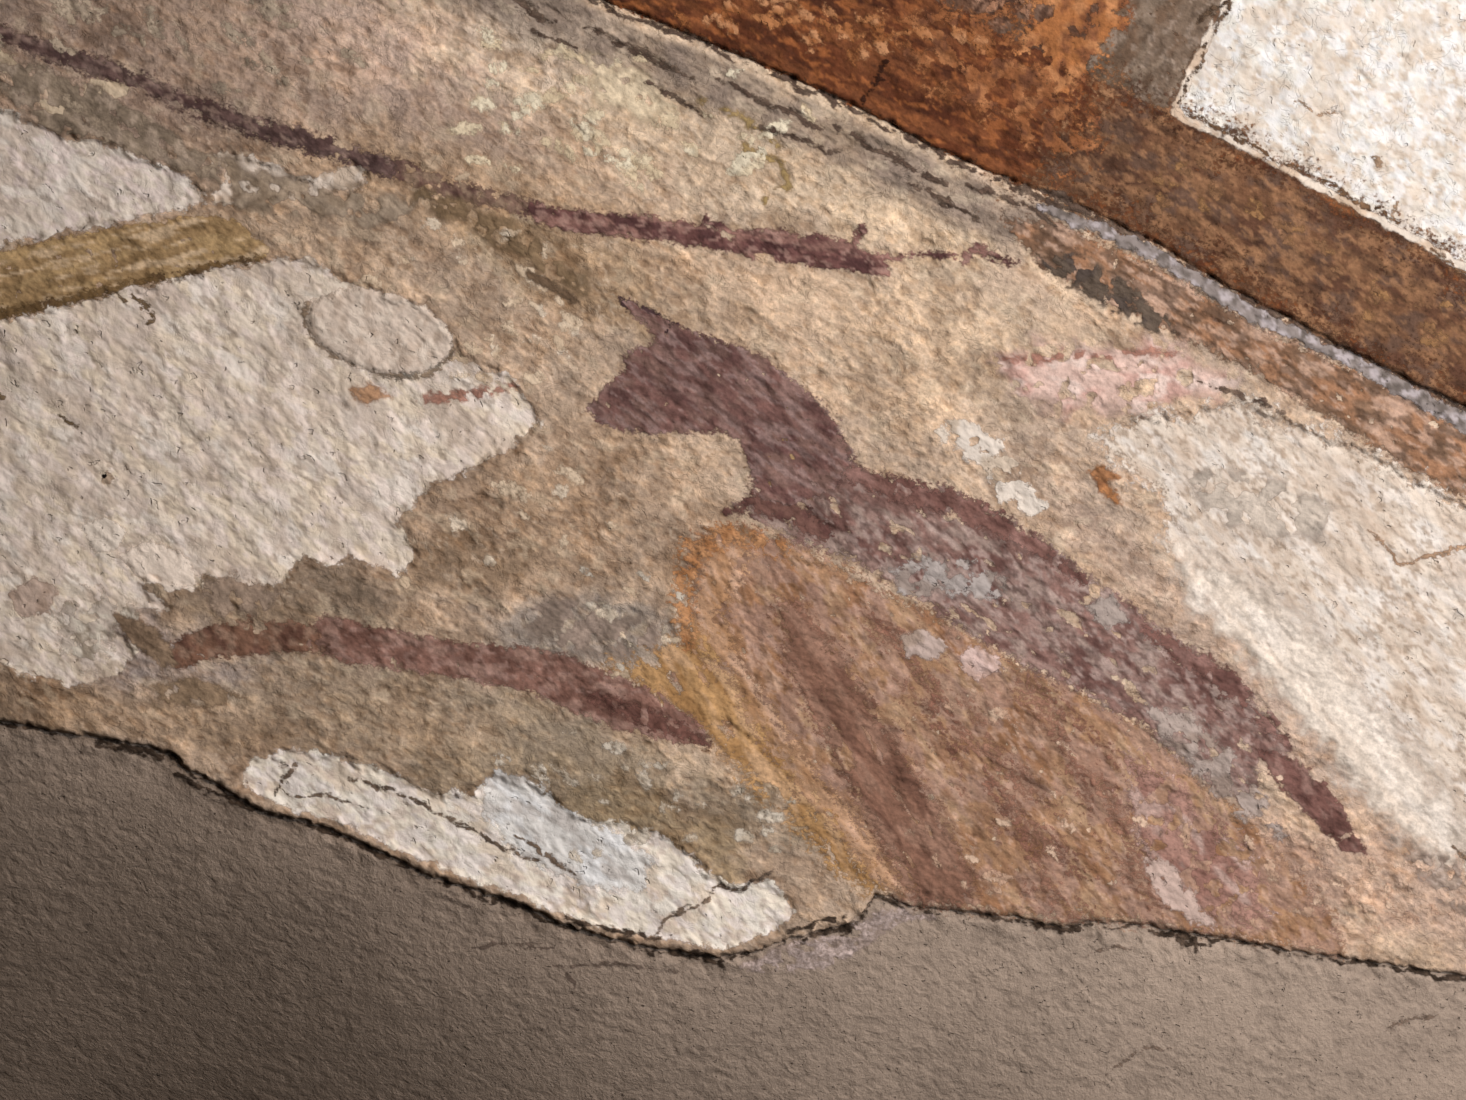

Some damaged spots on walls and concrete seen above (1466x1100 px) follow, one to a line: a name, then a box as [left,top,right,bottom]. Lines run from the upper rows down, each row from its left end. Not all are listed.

peeling [49,0,190,56]
peeling [0,76,368,250]
peeling [420,217,468,265]
peeling [0,243,585,689]
peeling [888,556,1007,604]
peeling [1085,393,1466,882]
peeling [243,740,796,950]
crack [0,722,1466,989]
peeling [961,854,1014,895]
peeling [1143,857,1214,927]
crack [1389,1014,1435,1029]
crack [1105,1046,1172,1076]